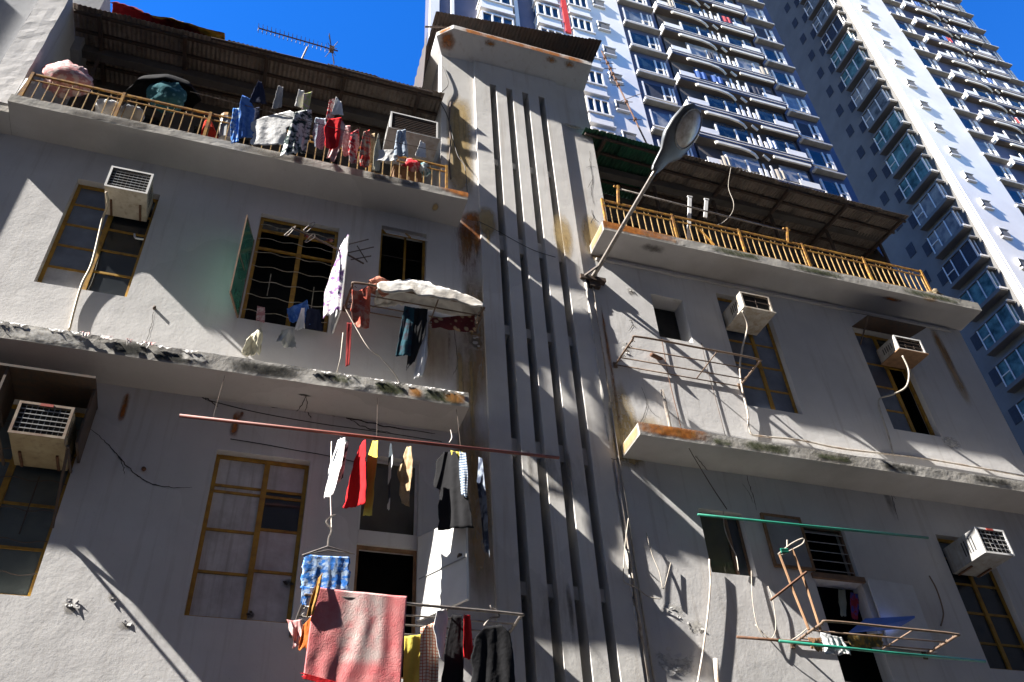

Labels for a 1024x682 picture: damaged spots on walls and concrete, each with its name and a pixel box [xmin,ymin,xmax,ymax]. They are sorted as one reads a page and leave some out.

corrosion [439,27,454,48]
corrosion [466,29,581,67]
corrosion [460,213,481,266]
leakage [115,343,187,362]
leakage [232,361,294,378]
corrosion [642,423,696,439]